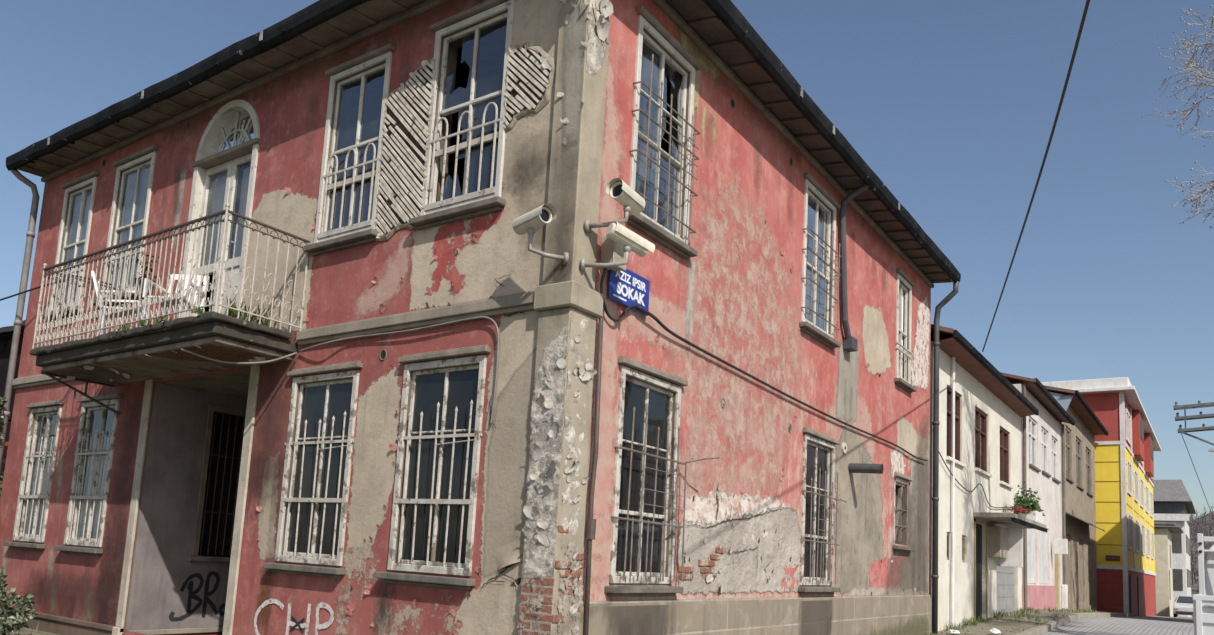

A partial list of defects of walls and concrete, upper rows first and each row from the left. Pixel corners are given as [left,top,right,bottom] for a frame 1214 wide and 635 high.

flaking render [240,187,318,332]
flaking render [334,365,402,635]
flaking render [357,0,625,317]
peeling [370,187,802,635]
crack [686,483,787,582]
flaking render [862,304,893,378]